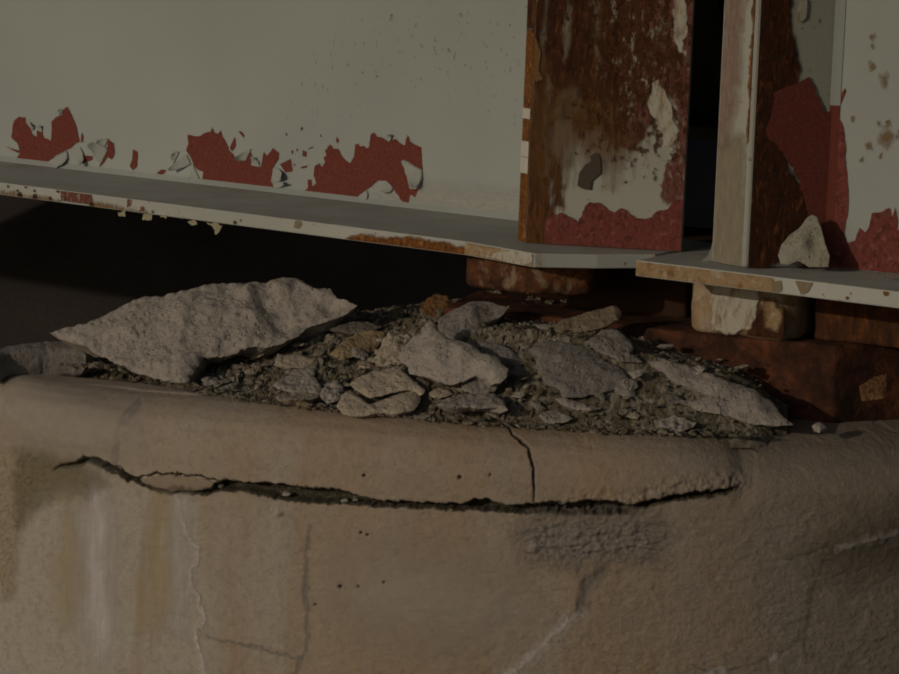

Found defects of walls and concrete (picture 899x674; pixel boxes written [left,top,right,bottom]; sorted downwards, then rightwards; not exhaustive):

peeling [7,107,115,168]
peeling [157,128,422,202]
corrosion [518,0,631,244]
corrosion [746,0,808,268]
peeling [766,77,899,273]
corrosion [347,234,465,254]
corrosion [747,299,785,339]
corrosion [859,374,887,401]
crack [57,427,736,517]
leakage [16,458,113,659]